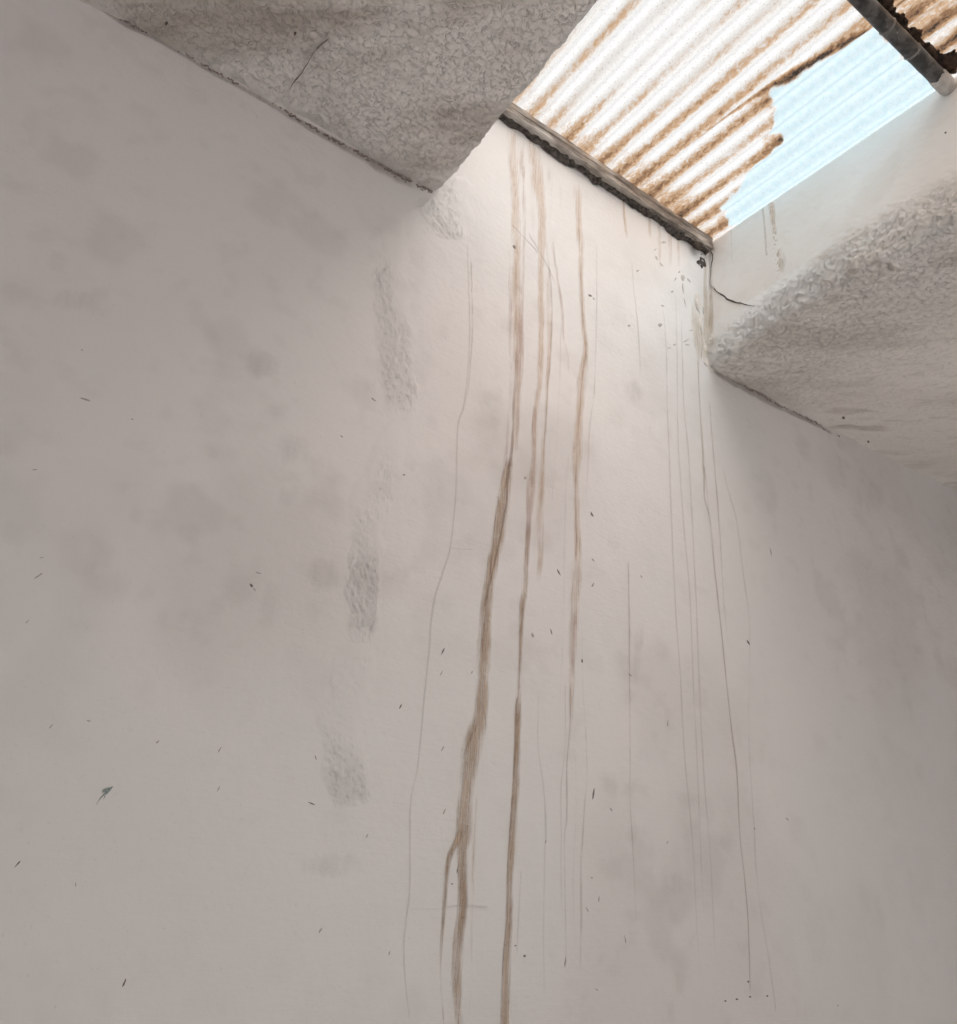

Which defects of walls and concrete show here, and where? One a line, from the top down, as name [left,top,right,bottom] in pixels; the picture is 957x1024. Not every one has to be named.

crack [710,251,752,306]